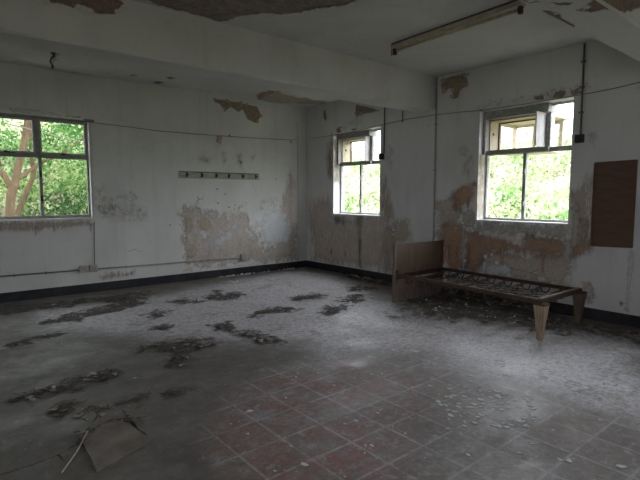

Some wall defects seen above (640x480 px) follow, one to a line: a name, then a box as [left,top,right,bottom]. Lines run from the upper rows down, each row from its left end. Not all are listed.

peeling [38,0,128,17]
peeling [142,0,356,22]
spalling [543,2,574,27]
spalling [576,0,640,12]
peeling [440,74,469,99]
peeling [213,98,263,123]
water stain [382,178,395,266]
peeling [443,207,570,281]